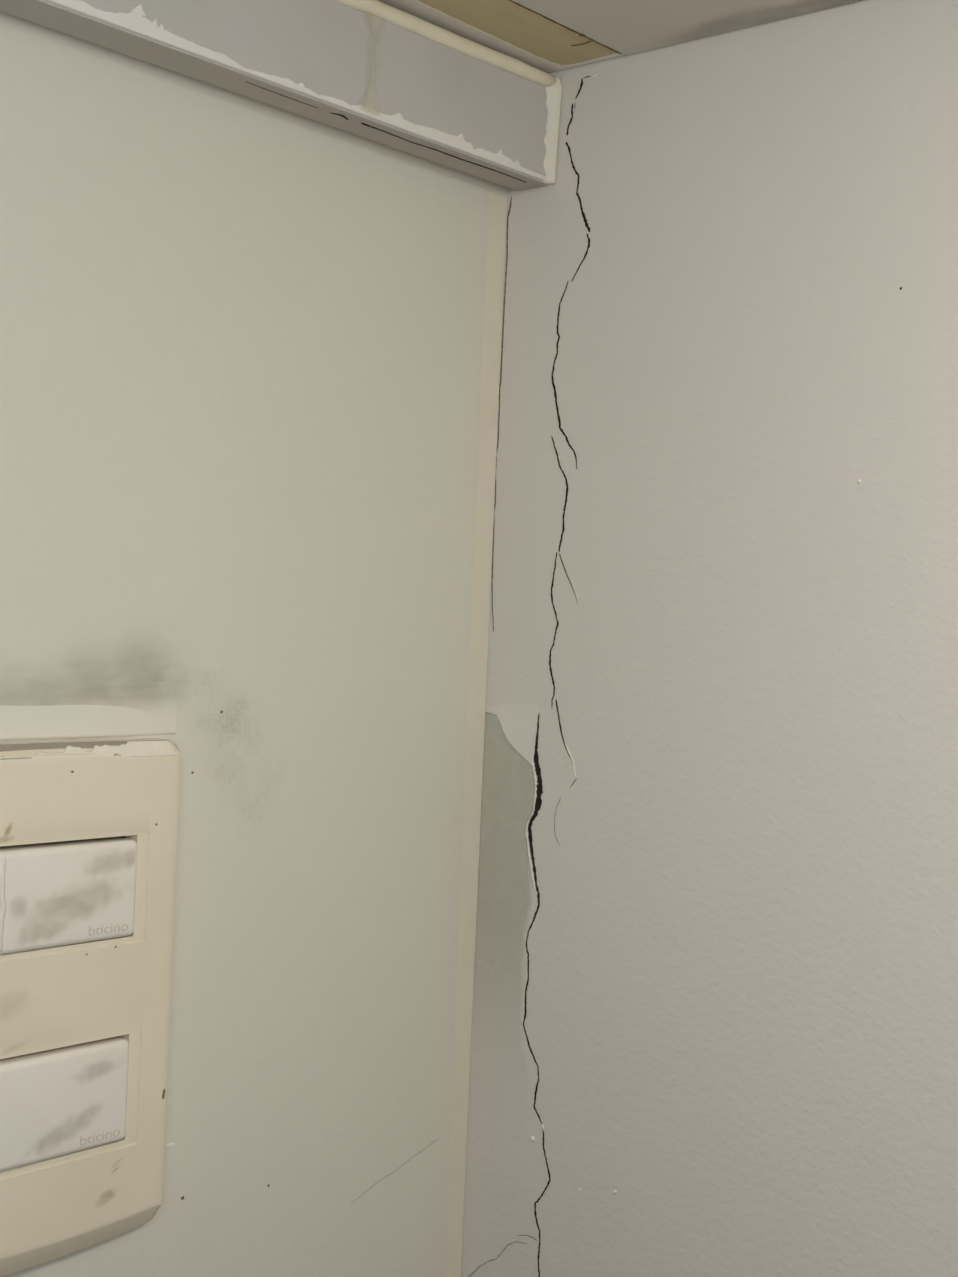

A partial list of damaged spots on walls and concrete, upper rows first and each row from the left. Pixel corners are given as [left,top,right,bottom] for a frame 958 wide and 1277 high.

peeling [49,0,547,180]
crack [245,81,527,632]
peeling [478,704,540,932]
crack [468,74,600,1277]